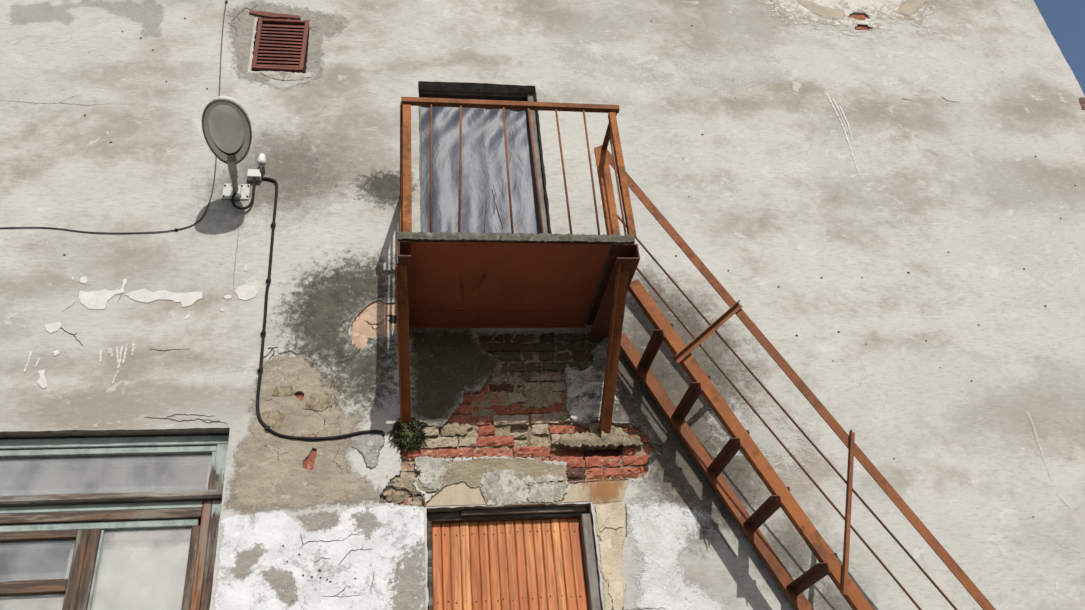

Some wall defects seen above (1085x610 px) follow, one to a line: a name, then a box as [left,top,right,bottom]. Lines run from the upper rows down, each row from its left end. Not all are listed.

peeling [760,0,947,43]
peeling [72,276,203,319]
peeling [220,284,258,311]
flaking render [350,301,397,349]
flaking render [213,329,732,610]
crack [300,534,398,597]